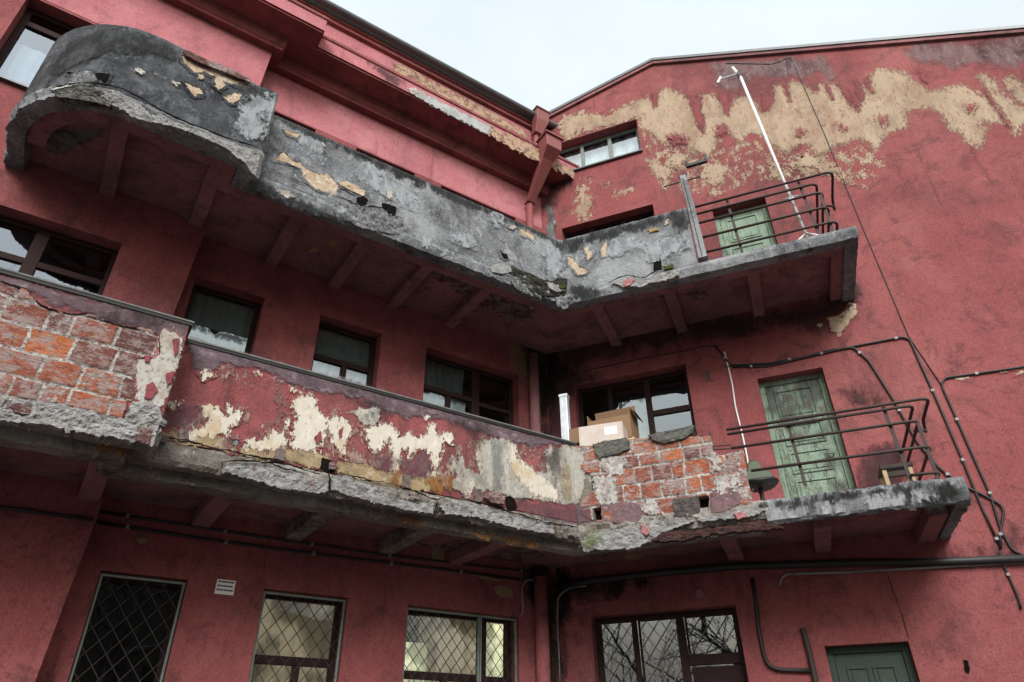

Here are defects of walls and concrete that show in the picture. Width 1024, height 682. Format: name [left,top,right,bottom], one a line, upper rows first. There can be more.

damp [44,27,181,88]
flaking render [172,50,253,109]
spalling [44,68,409,235]
spalling [377,63,540,161]
peeling [557,68,1024,189]
spalling [611,255,680,291]
damp [0,276,862,448]
crack [169,437,575,527]
flaking render [0,282,784,563]
damp [378,452,432,478]
damp [516,500,591,526]
damp [758,445,968,521]